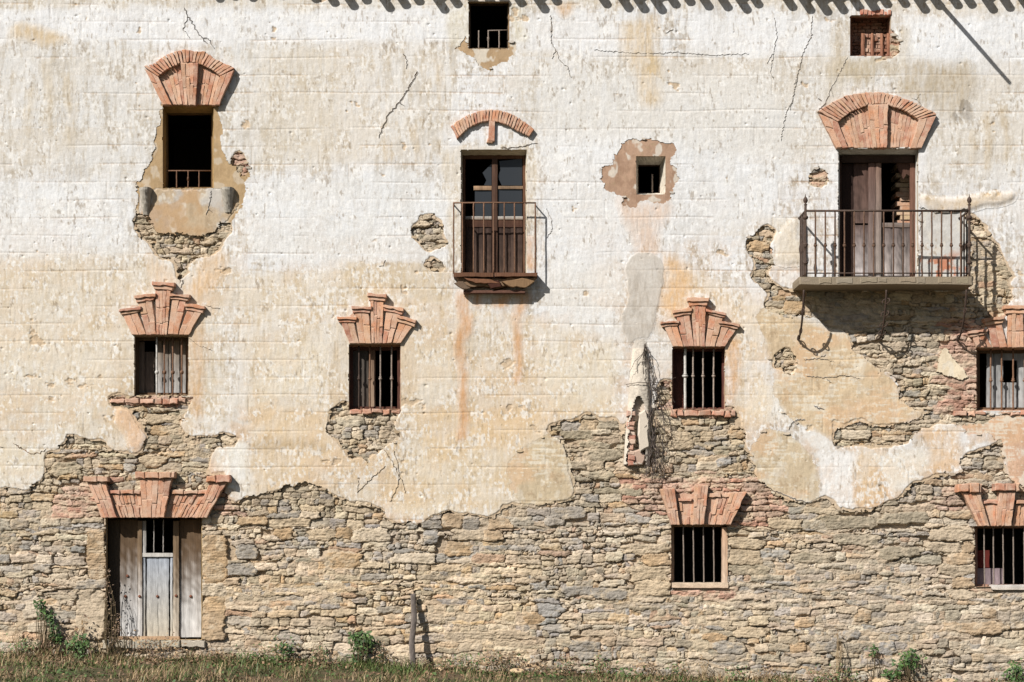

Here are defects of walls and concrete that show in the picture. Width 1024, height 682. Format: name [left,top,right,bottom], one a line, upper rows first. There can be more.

crack [379,54,418,137]
flaking render [455,37,516,71]
crack [596,16,848,139]
flaking render [133,103,252,281]
flaking render [600,138,680,208]
flaking render [410,213,449,271]
rust [452,287,534,445]
flaking render [506,208,1024,513]
flaking render [0,395,237,513]
flaking render [325,401,400,462]
flaking render [211,481,381,513]